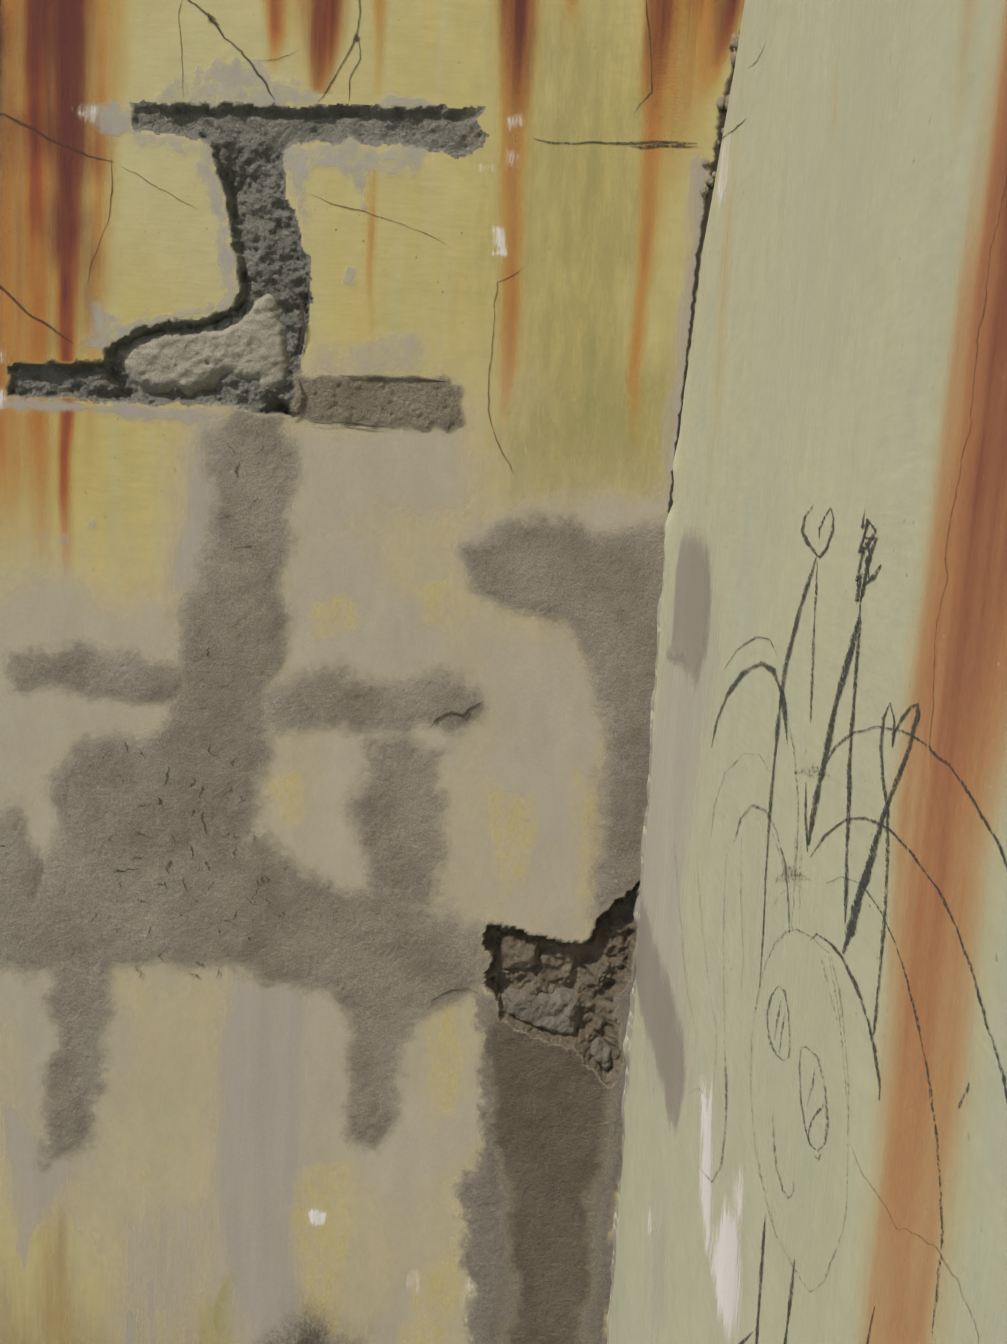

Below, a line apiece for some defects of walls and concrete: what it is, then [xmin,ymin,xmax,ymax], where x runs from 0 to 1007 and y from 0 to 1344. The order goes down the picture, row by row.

crack [178,0,294,100]
rust [303,0,342,93]
crack [321,0,361,101]
crack [0,285,71,342]
rust [0,0,110,578]
crack [0,113,197,284]
rust [501,0,535,404]
rust [629,0,745,405]
crack [667,33,765,514]
rust [863,3,1007,1344]
spalling [480,879,640,1088]
water stain [634,893,684,1123]